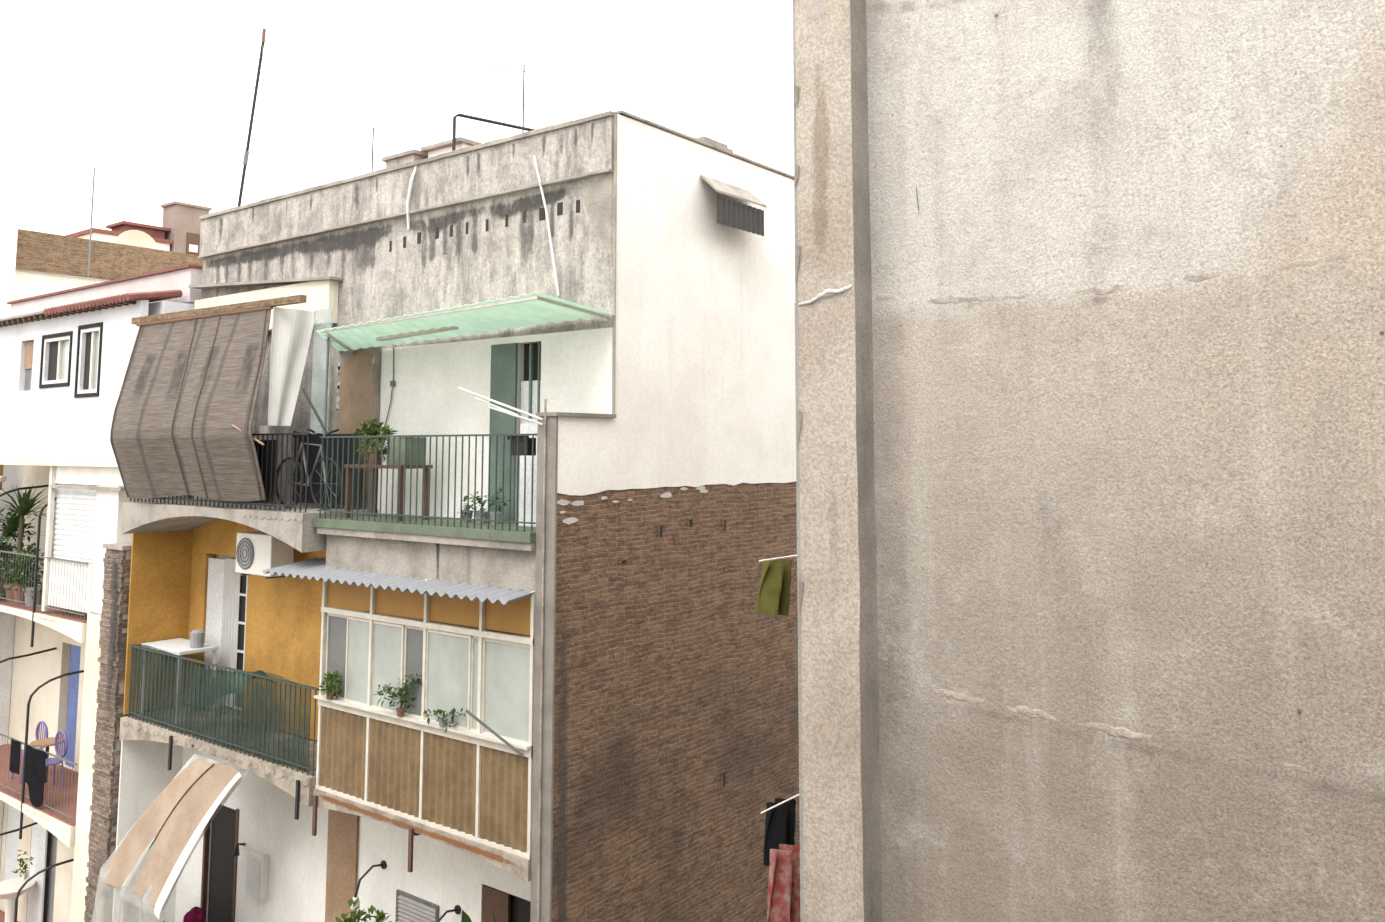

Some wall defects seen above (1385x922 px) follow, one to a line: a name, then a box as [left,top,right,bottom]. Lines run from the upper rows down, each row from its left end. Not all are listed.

damp [207,226,391,283]
damp [411,189,573,266]
crack [932,688,1152,741]